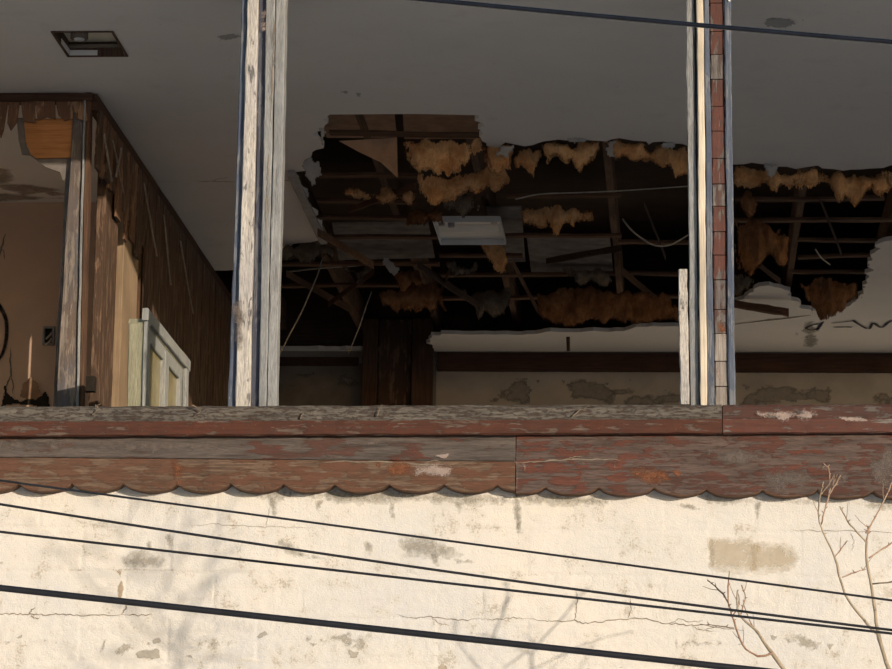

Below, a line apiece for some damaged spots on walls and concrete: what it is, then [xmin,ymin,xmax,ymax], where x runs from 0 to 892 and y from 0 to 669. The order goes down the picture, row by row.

flaking render [1,378,50,407]
peeling [562,380,680,405]
peeling [741,385,831,420]
peeling [376,454,453,476]
crack [400,598,734,632]